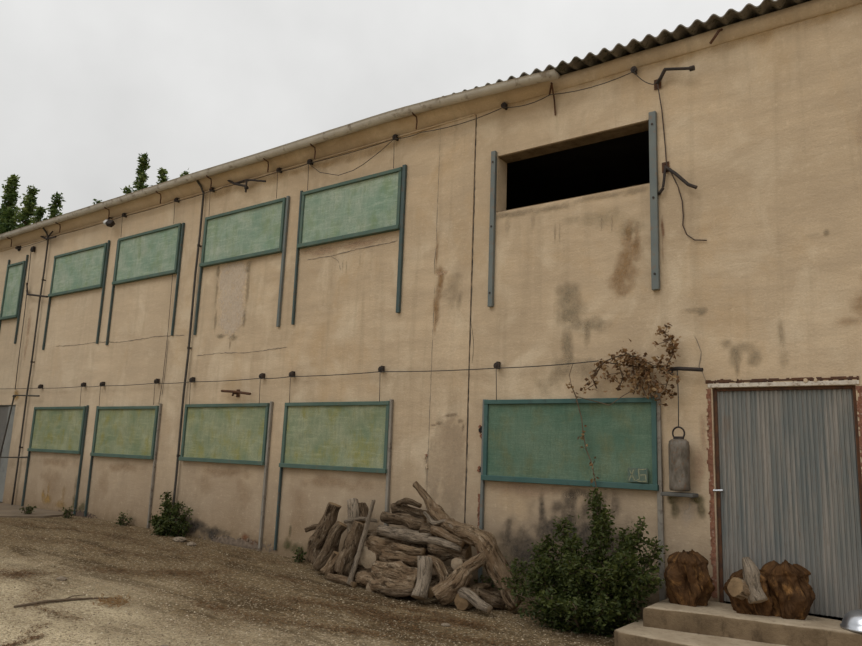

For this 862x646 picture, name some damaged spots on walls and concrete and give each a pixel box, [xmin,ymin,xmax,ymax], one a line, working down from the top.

spalling [705,376,862,598]